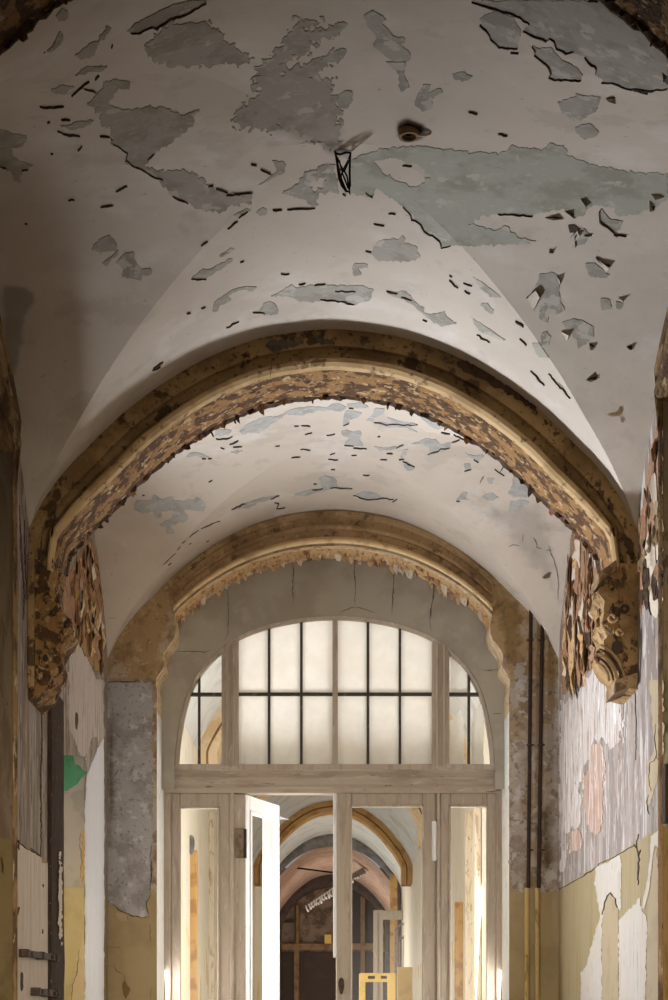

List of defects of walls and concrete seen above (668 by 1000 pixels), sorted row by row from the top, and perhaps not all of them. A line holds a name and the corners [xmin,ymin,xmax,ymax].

peeling [0,0,73,56]
peeling [127,0,353,151]
peeling [40,10,668,249]
peeling [471,0,668,140]
peeling [253,235,420,316]
peeling [386,290,456,327]
peeling [515,272,594,358]
flaking render [457,361,549,425]
peeling [530,370,571,399]
peeling [63,395,625,1000]
peeling [646,680,665,806]
peeling [580,831,658,1000]